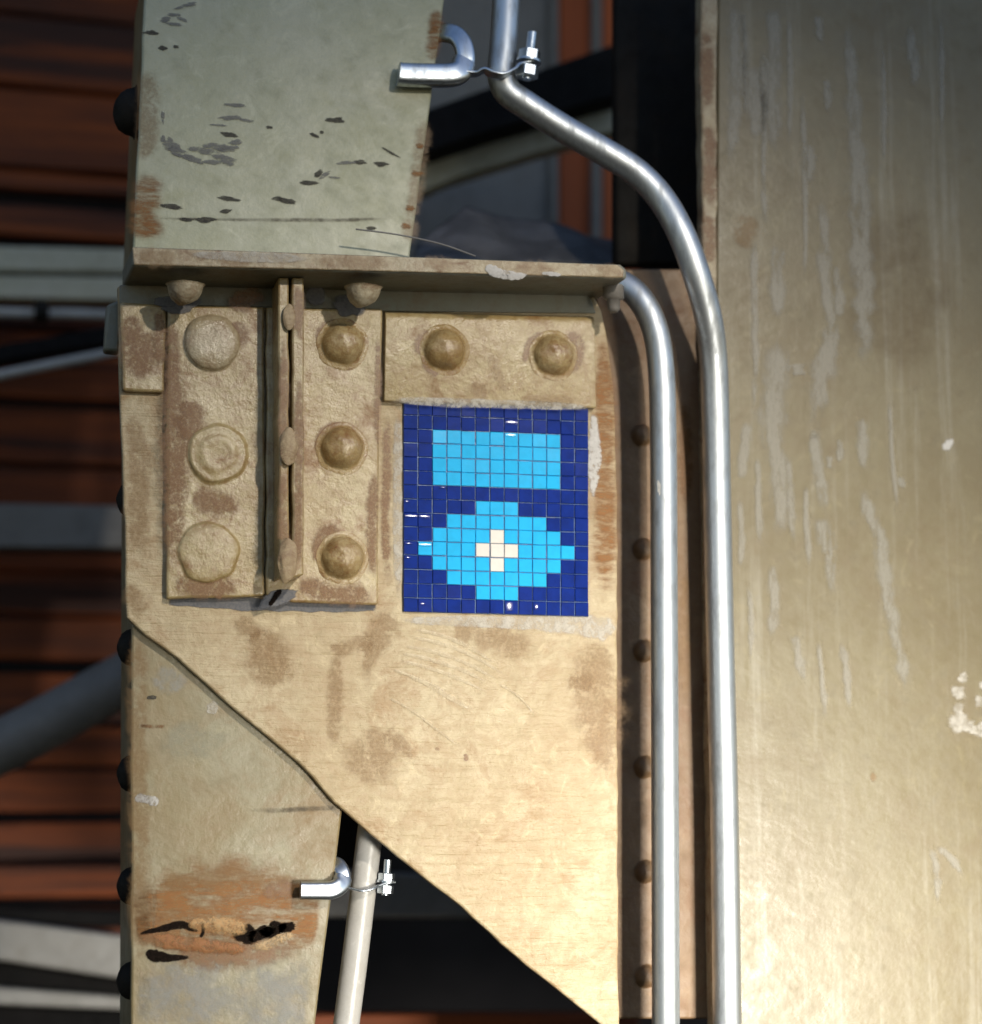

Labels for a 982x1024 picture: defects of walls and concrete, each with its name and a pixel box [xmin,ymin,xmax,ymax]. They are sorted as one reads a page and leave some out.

peeling [161,103,253,166]
peeling [310,117,344,138]
peeling [300,147,399,185]
corrosion [132,179,159,237]
peeling [160,196,240,223]
water stain [728,13,873,586]
water stain [862,497,907,676]
corrosion [136,863,318,966]